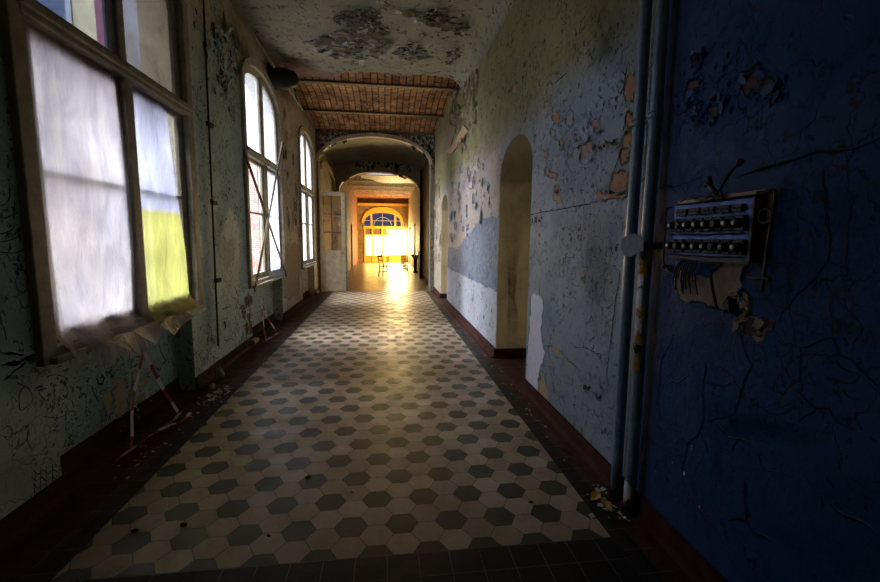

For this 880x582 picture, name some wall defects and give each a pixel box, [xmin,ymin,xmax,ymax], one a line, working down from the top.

peeling [303,0,470,69]
peeling [449,52,537,153]
crack [527,62,630,216]
peeling [543,70,636,206]
peeling [428,158,492,264]
peeling [525,292,564,401]
crack [648,324,753,484]
spalling [660,261,774,342]
crack [779,320,879,431]